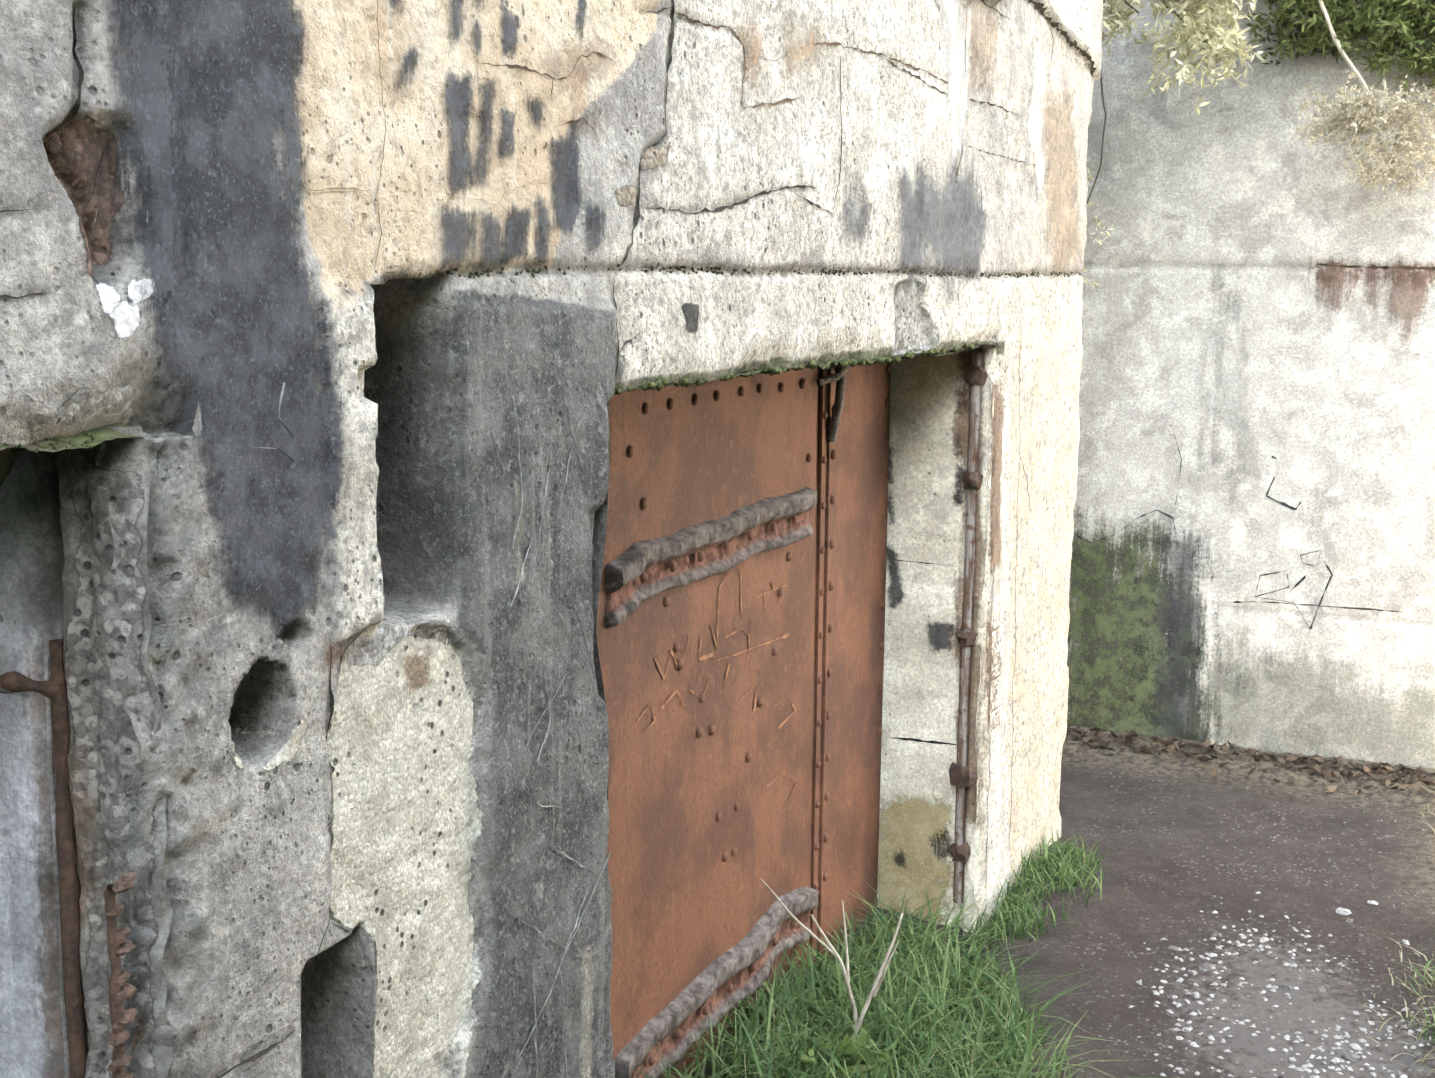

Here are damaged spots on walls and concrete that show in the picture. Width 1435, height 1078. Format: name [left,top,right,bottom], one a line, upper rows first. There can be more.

crack [0,7,113,213]
leakage [394,46,418,92]
leakage [450,0,485,57]
leakage [501,5,521,55]
leakage [440,72,606,271]
leakage [576,0,587,38]
crack [613,0,1096,377]
leakage [899,0,986,298]
crack [0,292,47,300]
leakage [107,0,350,648]
rust [1317,259,1435,337]
rust [949,346,1004,825]